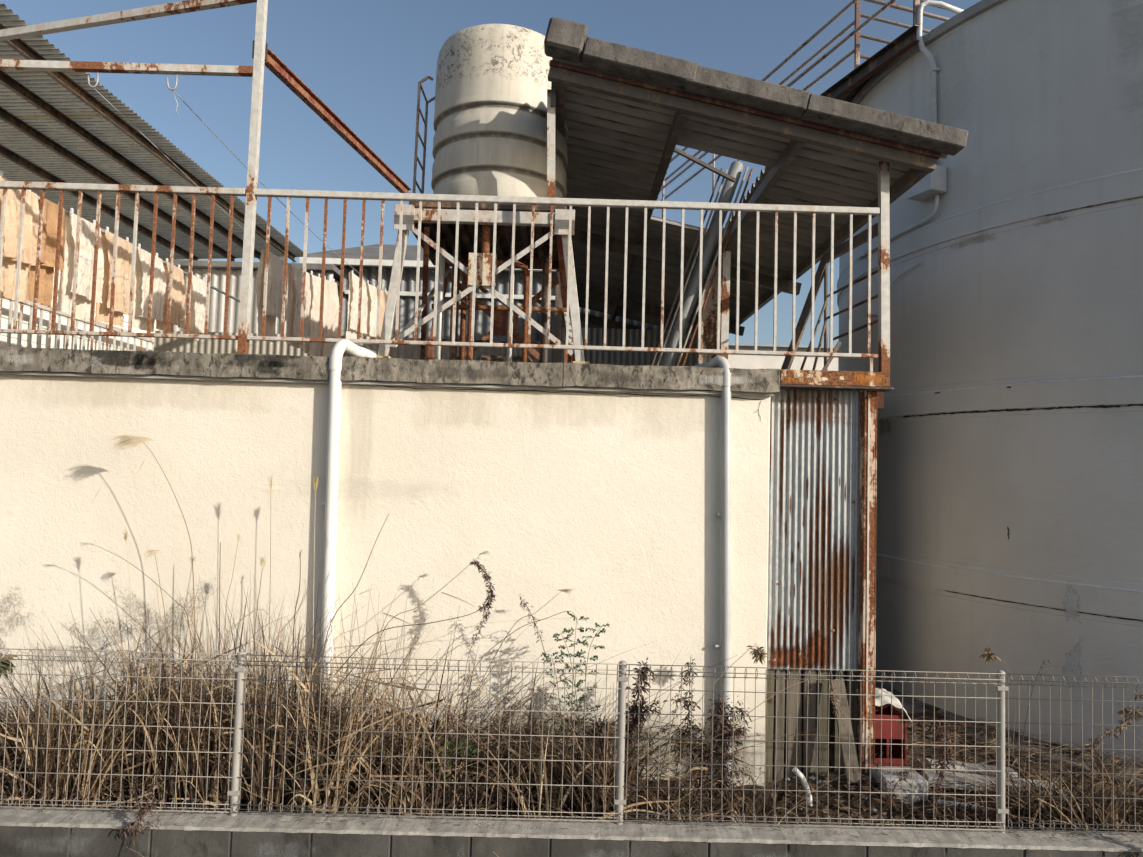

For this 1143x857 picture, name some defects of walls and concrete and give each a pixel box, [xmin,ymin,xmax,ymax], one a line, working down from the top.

crack [1046,197,1142,216]
corrosion [854,374,882,384]
corrosion [767,377,855,671]